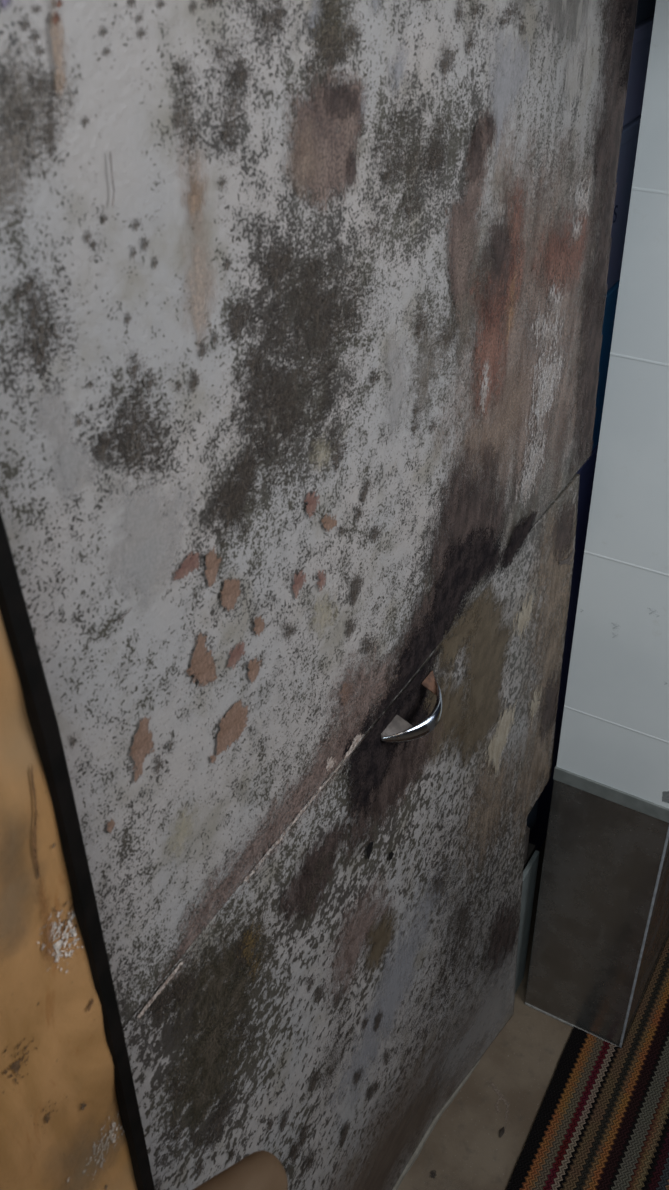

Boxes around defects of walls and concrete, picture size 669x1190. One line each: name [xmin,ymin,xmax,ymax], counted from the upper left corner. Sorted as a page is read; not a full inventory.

damp [0,0,74,229]
damp [75,0,519,552]
damp [0,251,85,397]
peeling [304,492,337,532]
peeling [173,546,241,612]
peeling [293,570,326,599]
damp [143,0,638,1190]
peeling [186,615,265,689]
peeling [130,717,155,783]
peeling [210,700,249,763]